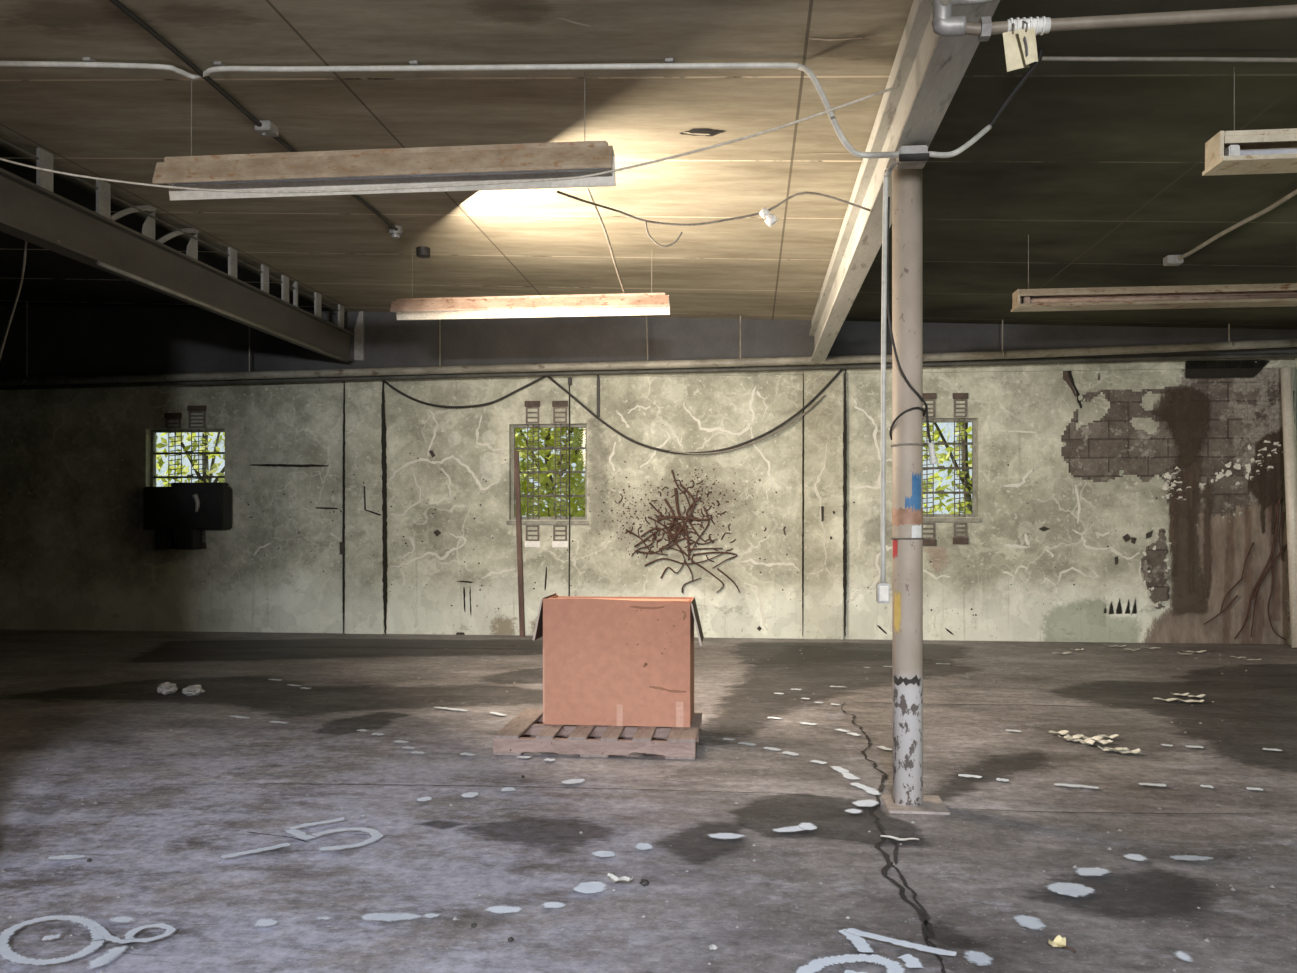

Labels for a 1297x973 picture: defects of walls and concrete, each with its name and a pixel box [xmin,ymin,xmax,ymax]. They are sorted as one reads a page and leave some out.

crack [1063,371,1082,408]
crack [381,381,547,649]
crack [609,369,892,637]
crack [923,569,954,635]
crack [1003,468,1035,488]
crack [1002,484,1151,616]
peeling [1061,360,1284,609]
leakage [1153,386,1213,615]
leakage [1248,430,1285,535]
leakage [656,823,745,861]
crack [502,702,946,973]
crack [979,807,1232,815]